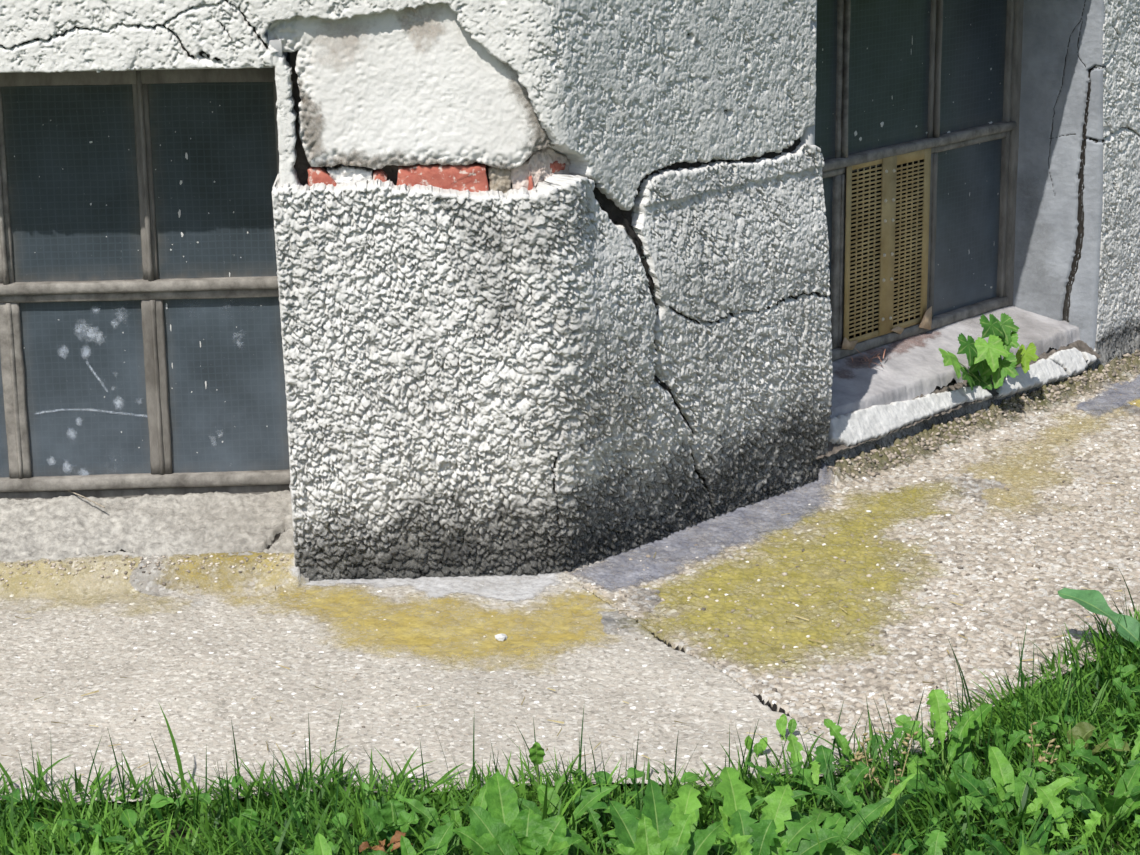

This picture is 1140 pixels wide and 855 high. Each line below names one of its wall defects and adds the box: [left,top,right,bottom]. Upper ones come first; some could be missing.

crack [0,0,268,58]
flaking render [267,3,570,193]
crack [1048,0,1138,322]
crack [587,138,827,517]
leakage [291,322,1140,601]
crack [636,619,685,653]
crack [740,685,816,734]